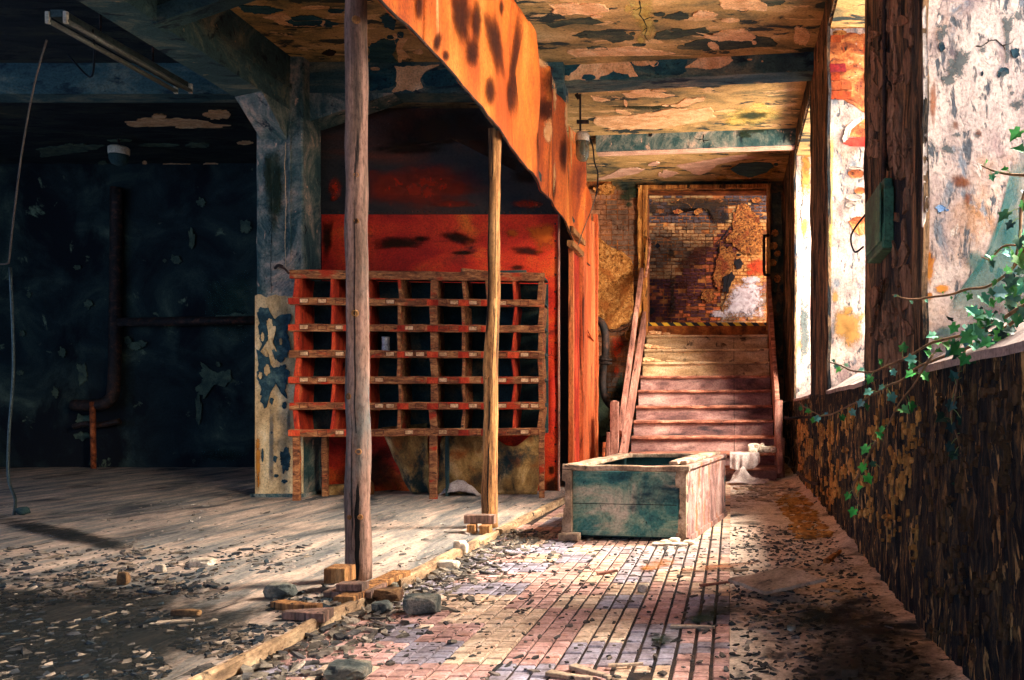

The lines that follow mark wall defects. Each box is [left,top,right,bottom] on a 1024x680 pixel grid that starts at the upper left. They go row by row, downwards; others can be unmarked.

peeling [368,14,458,93]
peeling [546,0,786,137]
spalling [997,48,1020,78]
peeling [36,109,231,165]
corrosion [368,169,469,207]
peeling [593,154,778,196]
peeling [829,0,949,370]
peeling [701,192,783,313]
damp [713,259,763,317]
peeling [215,307,291,409]
peeling [195,361,233,425]
peeling [261,447,291,484]